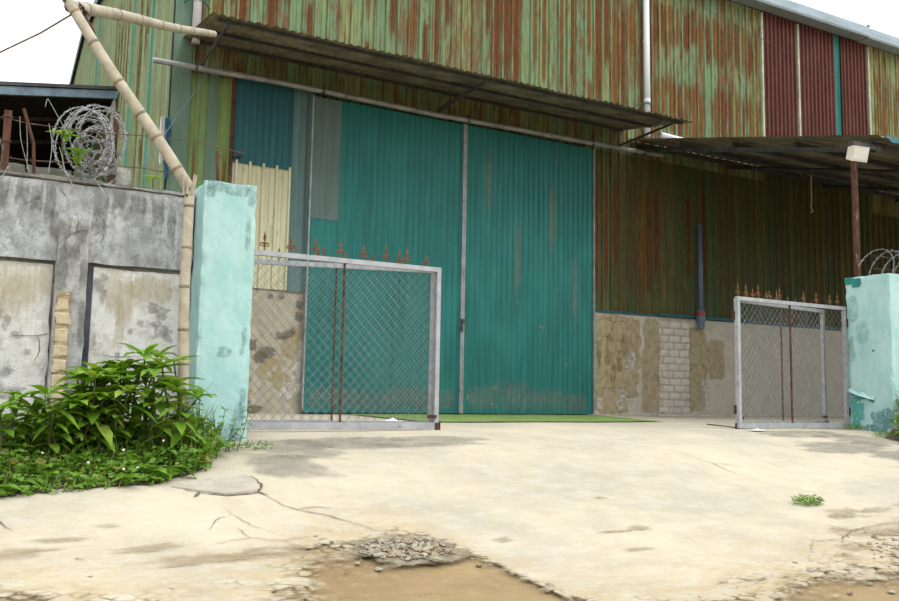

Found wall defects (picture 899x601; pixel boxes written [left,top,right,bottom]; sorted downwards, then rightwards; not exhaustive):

corrosion [115,0,151,99]
corrosion [410,0,450,66]
corrosion [486,0,519,82]
corrosion [533,0,547,74]
corrosion [560,0,574,92]
corrosion [587,0,634,104]
corrosion [653,2,758,75]
corrosion [653,78,703,138]
corrosion [714,89,760,137]
corrosion [876,81,899,137]
corrosion [595,176,618,287]
crack [186,475,379,546]